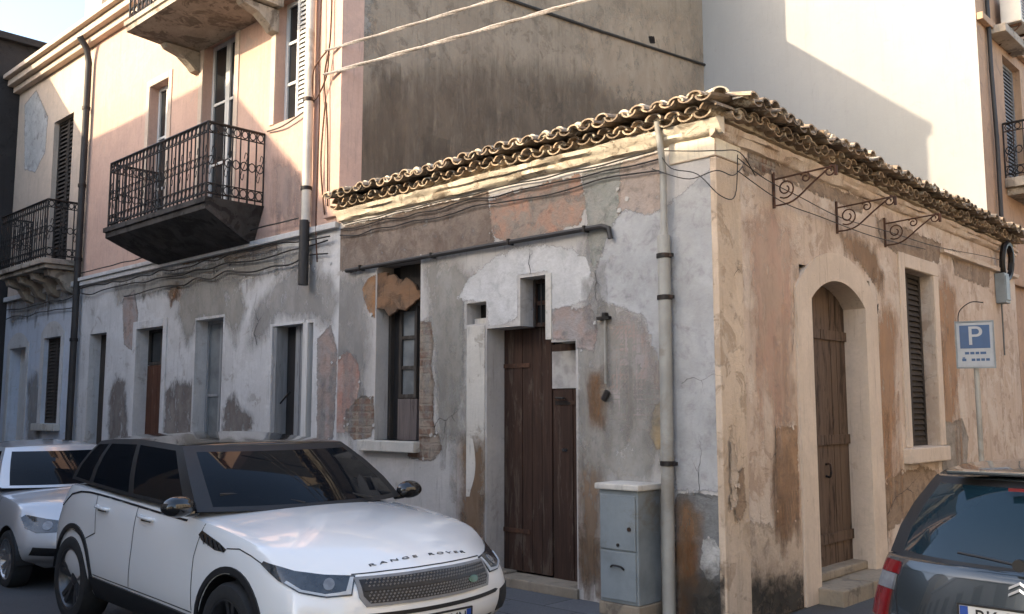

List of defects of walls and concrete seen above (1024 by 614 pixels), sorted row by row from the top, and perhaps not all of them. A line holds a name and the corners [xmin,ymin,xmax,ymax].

flaking render [329,152,660,317]
flaking render [122,291,138,350]
peeling [179,242,375,440]
water stain [108,378,128,439]
water stain [164,381,192,433]
water stain [222,395,252,431]
spalling [407,310,465,461]
water stain [681,572,725,614]
water stain [751,574,804,614]